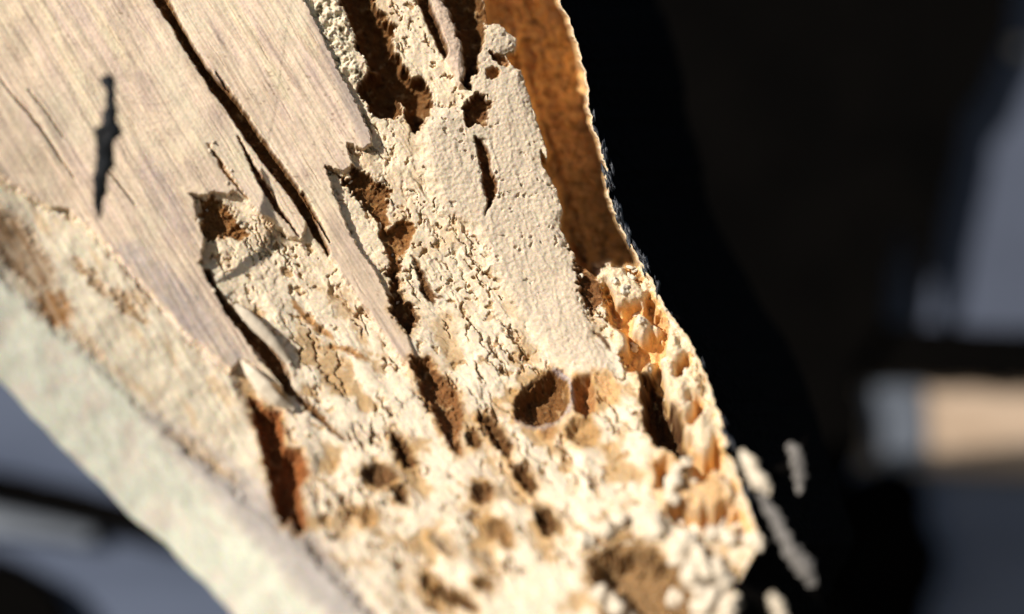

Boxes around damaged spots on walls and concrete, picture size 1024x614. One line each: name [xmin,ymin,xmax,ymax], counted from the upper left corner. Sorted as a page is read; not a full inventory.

spalling [337,0,436,136]
spalling [443,0,512,130]
crack [151,0,334,259]
spalling [191,193,253,244]
spalling [325,164,393,229]
spalling [384,253,422,336]
spalling [568,244,609,320]
spalling [249,398,310,536]
spalling [360,431,418,506]
spalling [409,357,559,538]
spalling [639,367,687,461]
spalling [585,540,696,614]